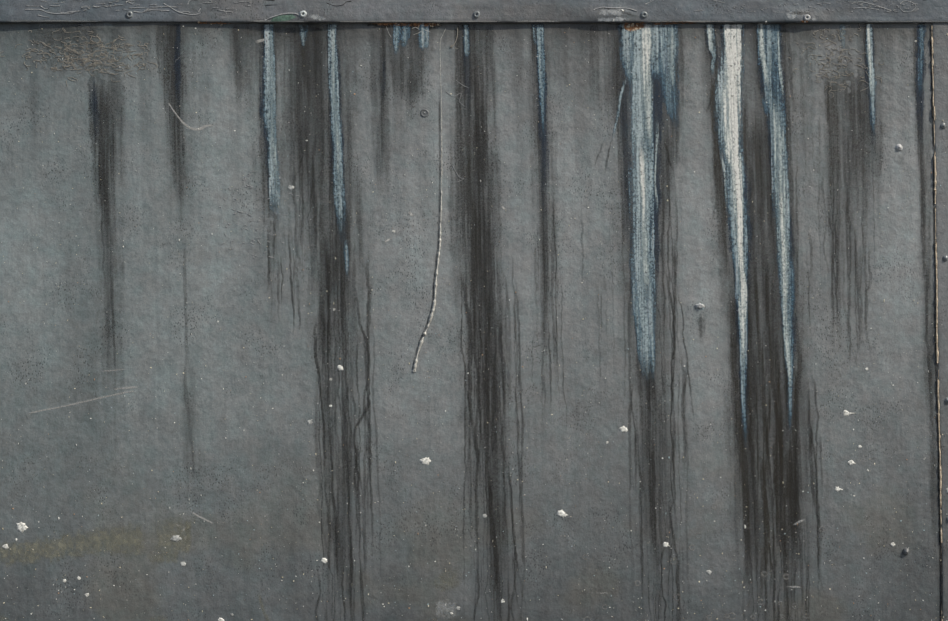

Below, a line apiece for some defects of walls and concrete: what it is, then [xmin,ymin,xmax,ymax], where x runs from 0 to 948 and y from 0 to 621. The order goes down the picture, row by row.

damp [260,24,280,207]
damp [300,24,361,305]
damp [456,24,505,463]
damp [531,24,556,286]
damp [613,23,684,540]
damp [704,24,802,596]
damp [848,24,877,179]